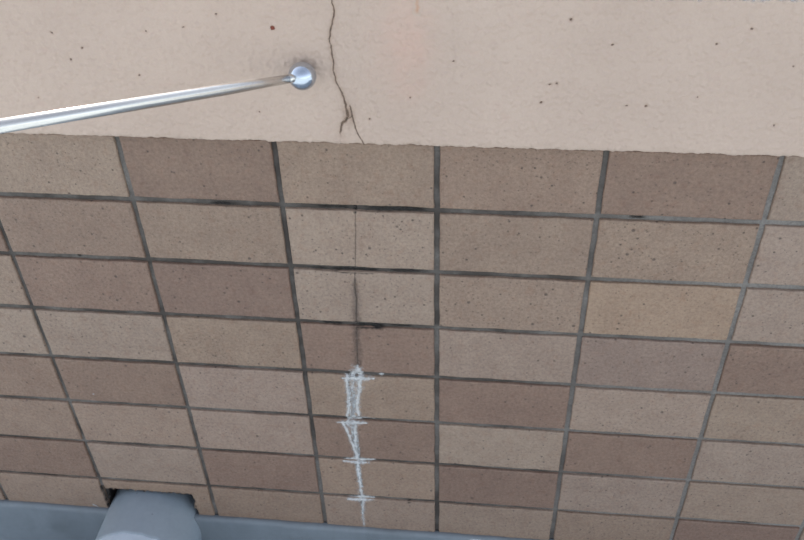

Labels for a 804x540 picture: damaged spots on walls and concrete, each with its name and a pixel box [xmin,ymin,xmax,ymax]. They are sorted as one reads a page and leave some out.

crack [322,0,364,144]